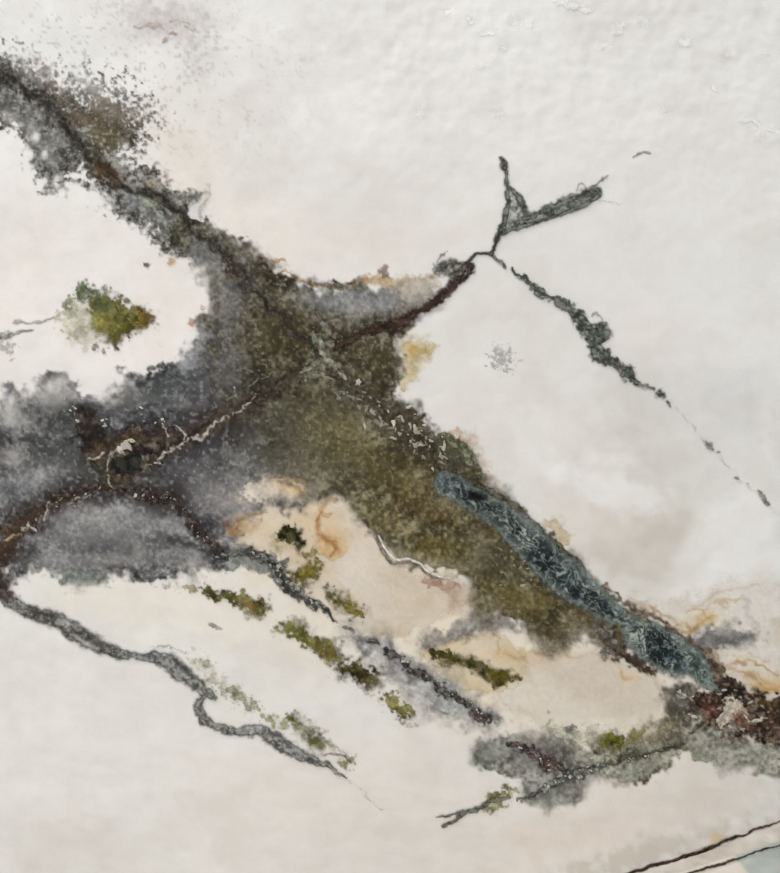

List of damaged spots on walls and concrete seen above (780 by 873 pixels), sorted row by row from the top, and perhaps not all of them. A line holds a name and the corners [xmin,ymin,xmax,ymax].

crack [0,68,671,569]
damp [0,56,780,730]
crack [0,480,492,779]
crack [485,547,532,588]
crack [436,742,683,828]
damp [434,629,780,807]
crack [628,821,780,873]
crack [758,490,770,506]